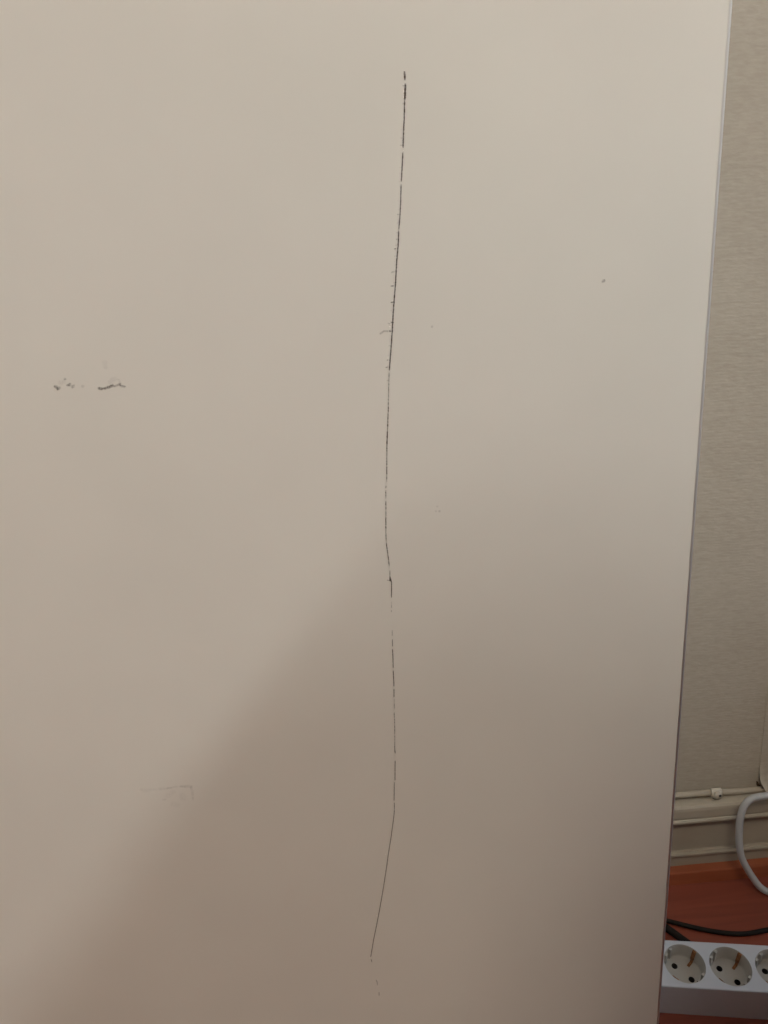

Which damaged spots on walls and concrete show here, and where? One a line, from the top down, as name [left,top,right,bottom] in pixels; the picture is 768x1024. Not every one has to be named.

crack [385,71,406,597]
crack [371,782,395,962]